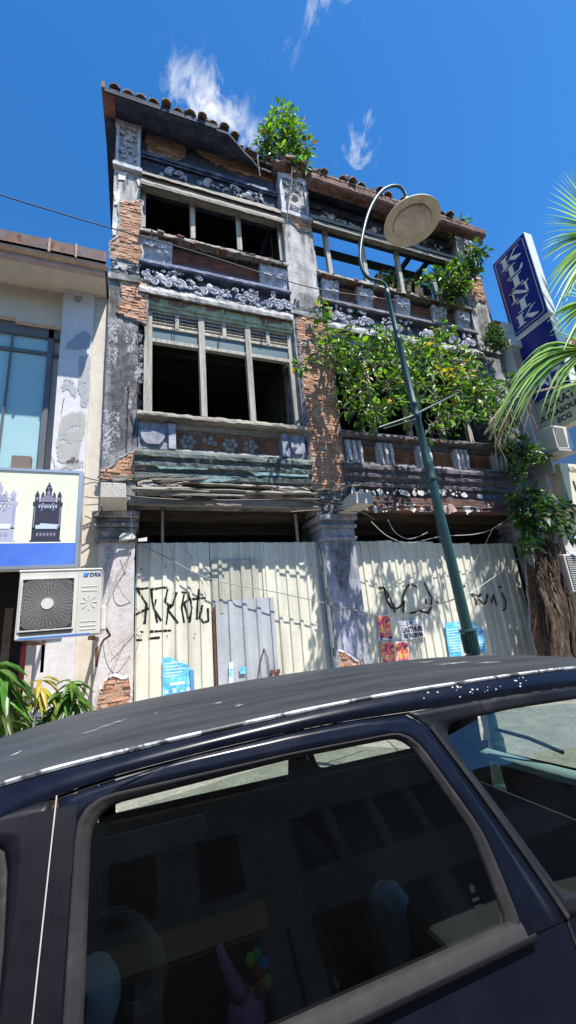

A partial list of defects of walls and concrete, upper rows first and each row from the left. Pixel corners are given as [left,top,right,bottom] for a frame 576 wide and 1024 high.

flaking render [145,133,276,183]
flaking render [108,172,192,327]
peeling [56,330,92,469]
damp [102,267,144,459]
flaking render [97,315,491,515]
flaking render [319,550,365,668]
flaking render [93,673,133,710]